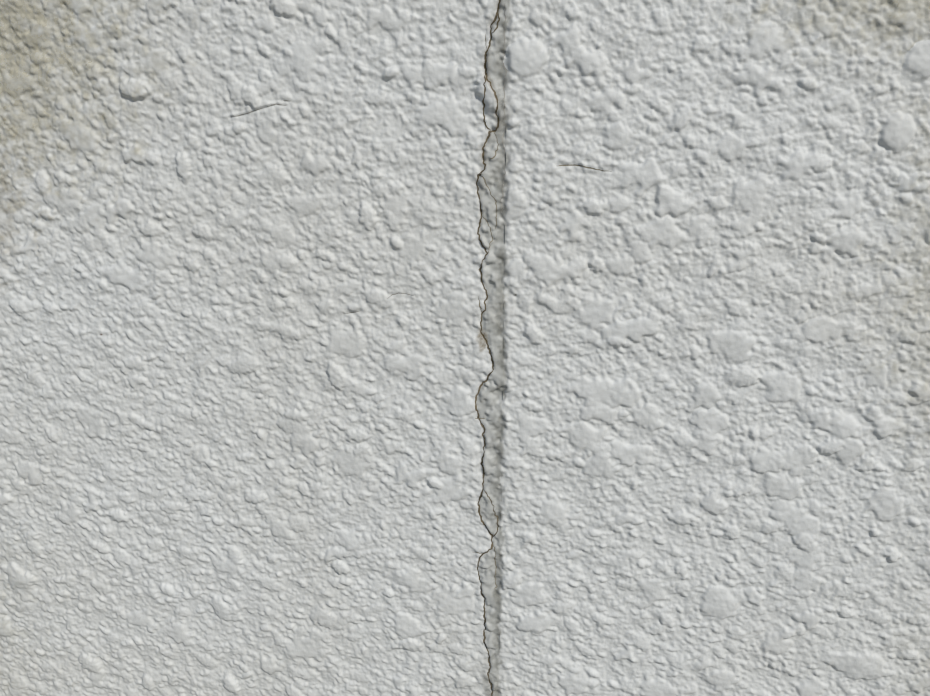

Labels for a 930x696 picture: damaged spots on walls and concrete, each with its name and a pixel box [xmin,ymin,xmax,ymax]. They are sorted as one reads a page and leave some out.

crack [473,0,507,696]